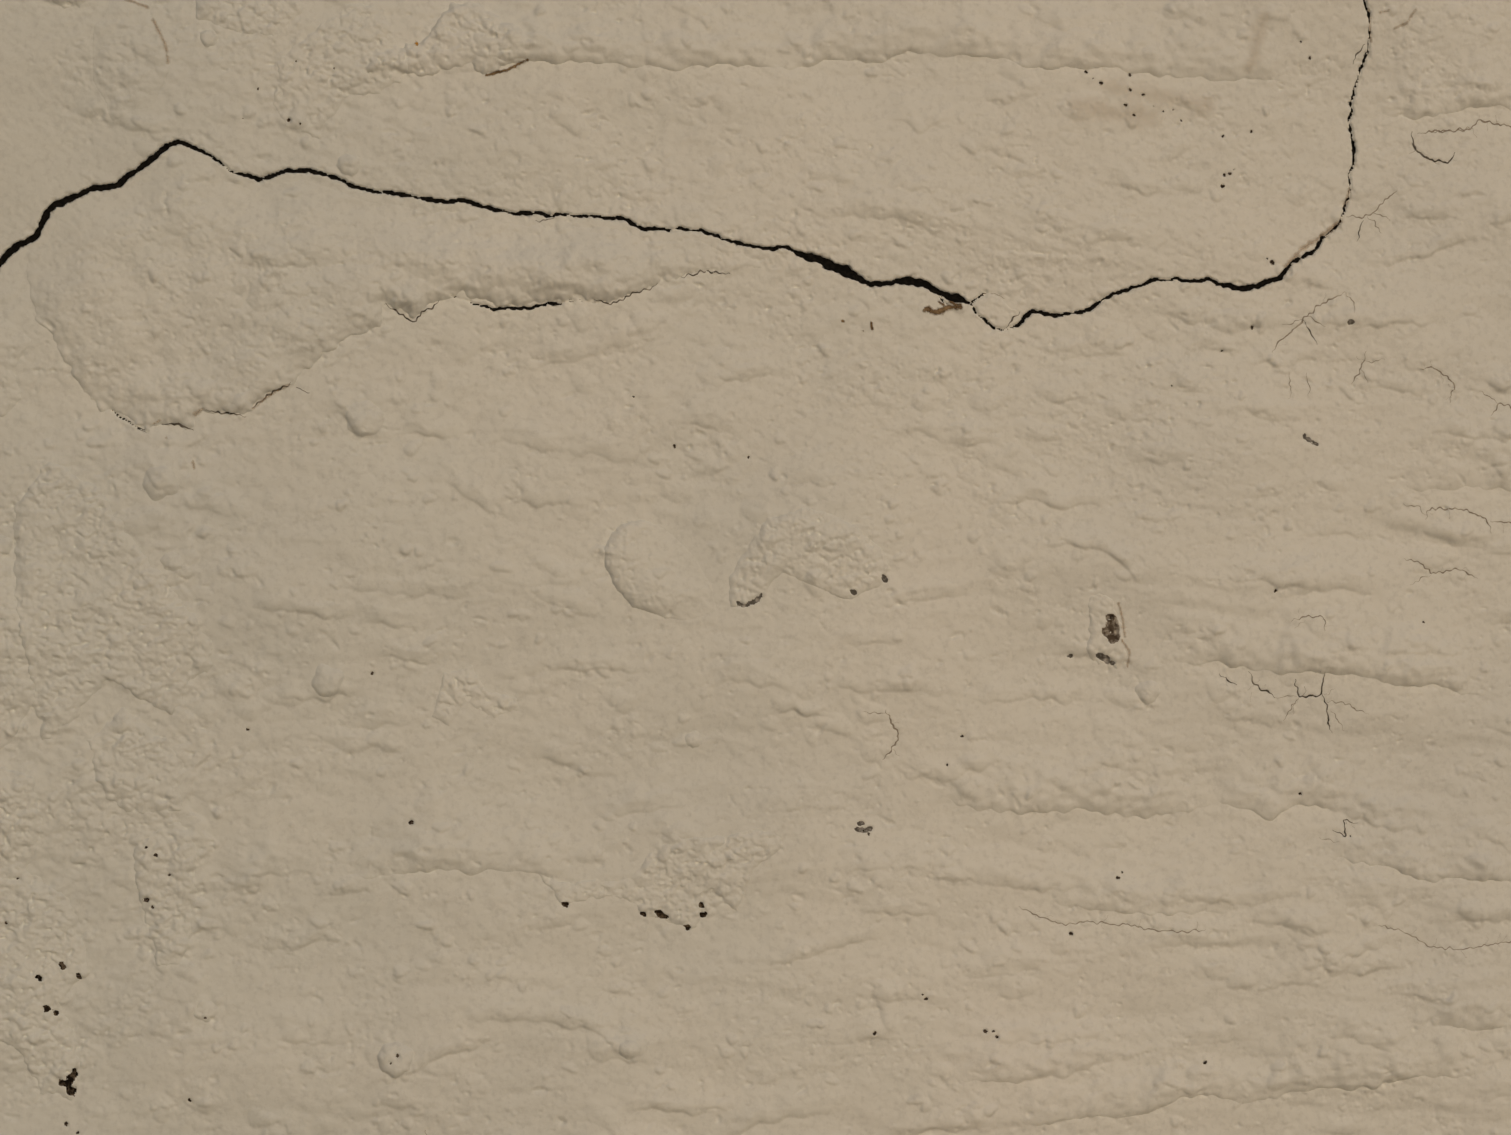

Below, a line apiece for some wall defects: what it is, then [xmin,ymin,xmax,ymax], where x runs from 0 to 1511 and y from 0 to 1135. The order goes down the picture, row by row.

crack [0,0,1395,331]
crack [1275,292,1355,397]
peeling [0,767,90,1100]
peeling [133,822,198,966]